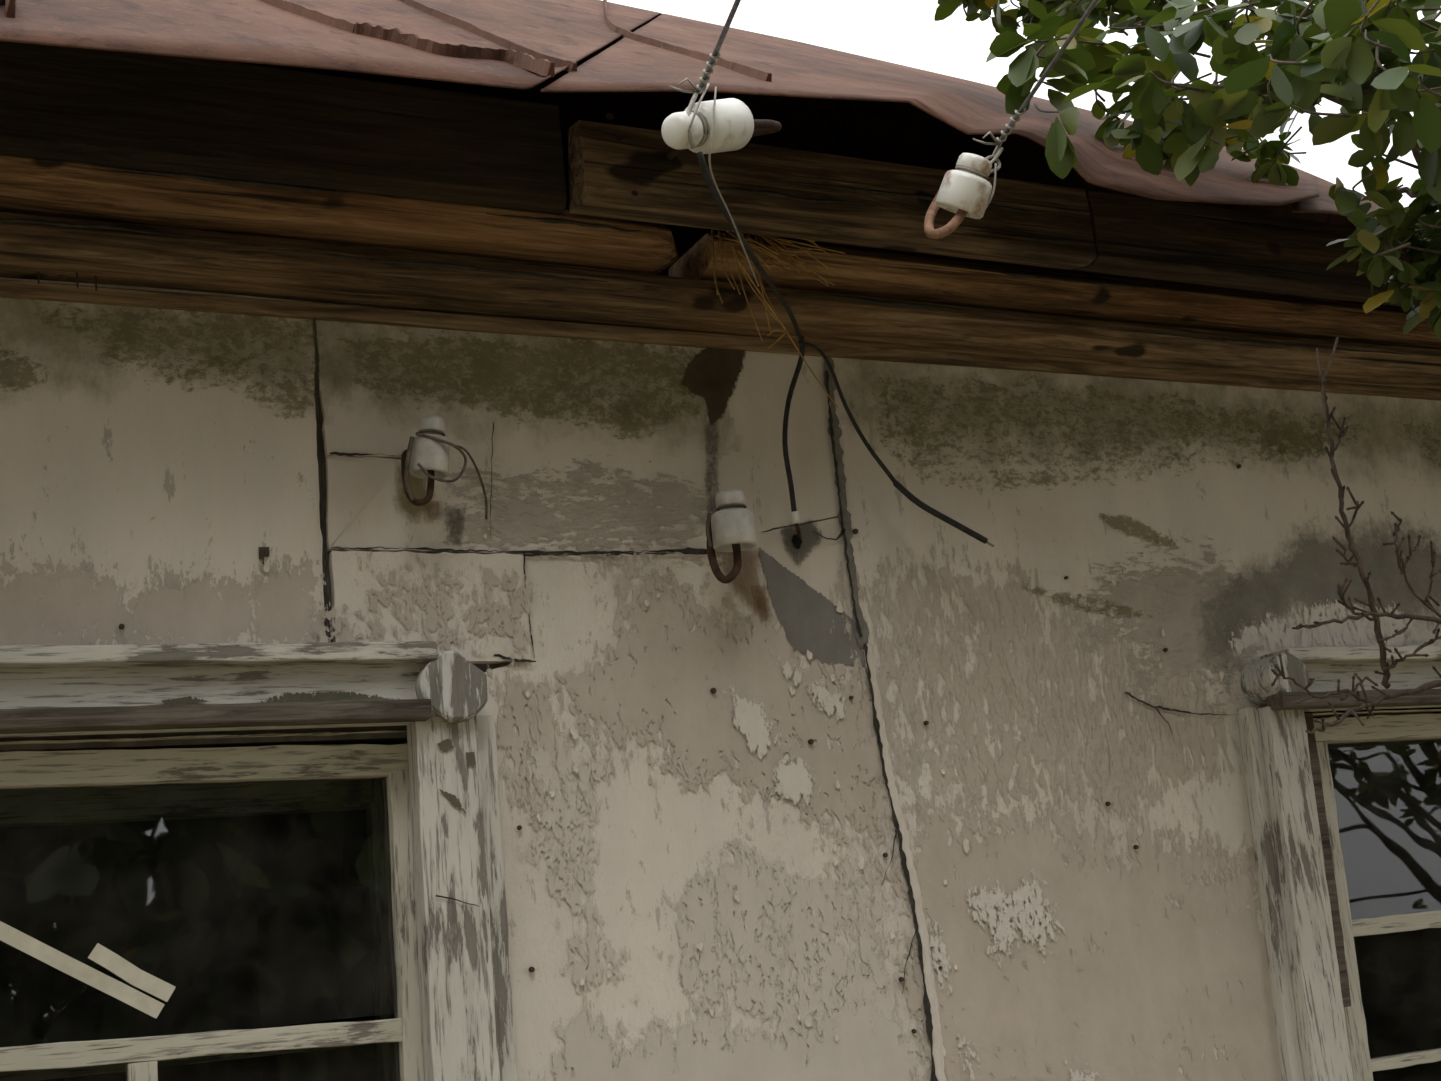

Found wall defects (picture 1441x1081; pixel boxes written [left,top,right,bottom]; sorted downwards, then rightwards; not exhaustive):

water stain [0,298,317,418]
crack [314,318,707,662]
water stain [340,335,746,513]
water stain [880,378,1441,491]
water stain [1204,524,1441,668]
peeling [0,454,1282,1081]
crack [812,357,938,1081]